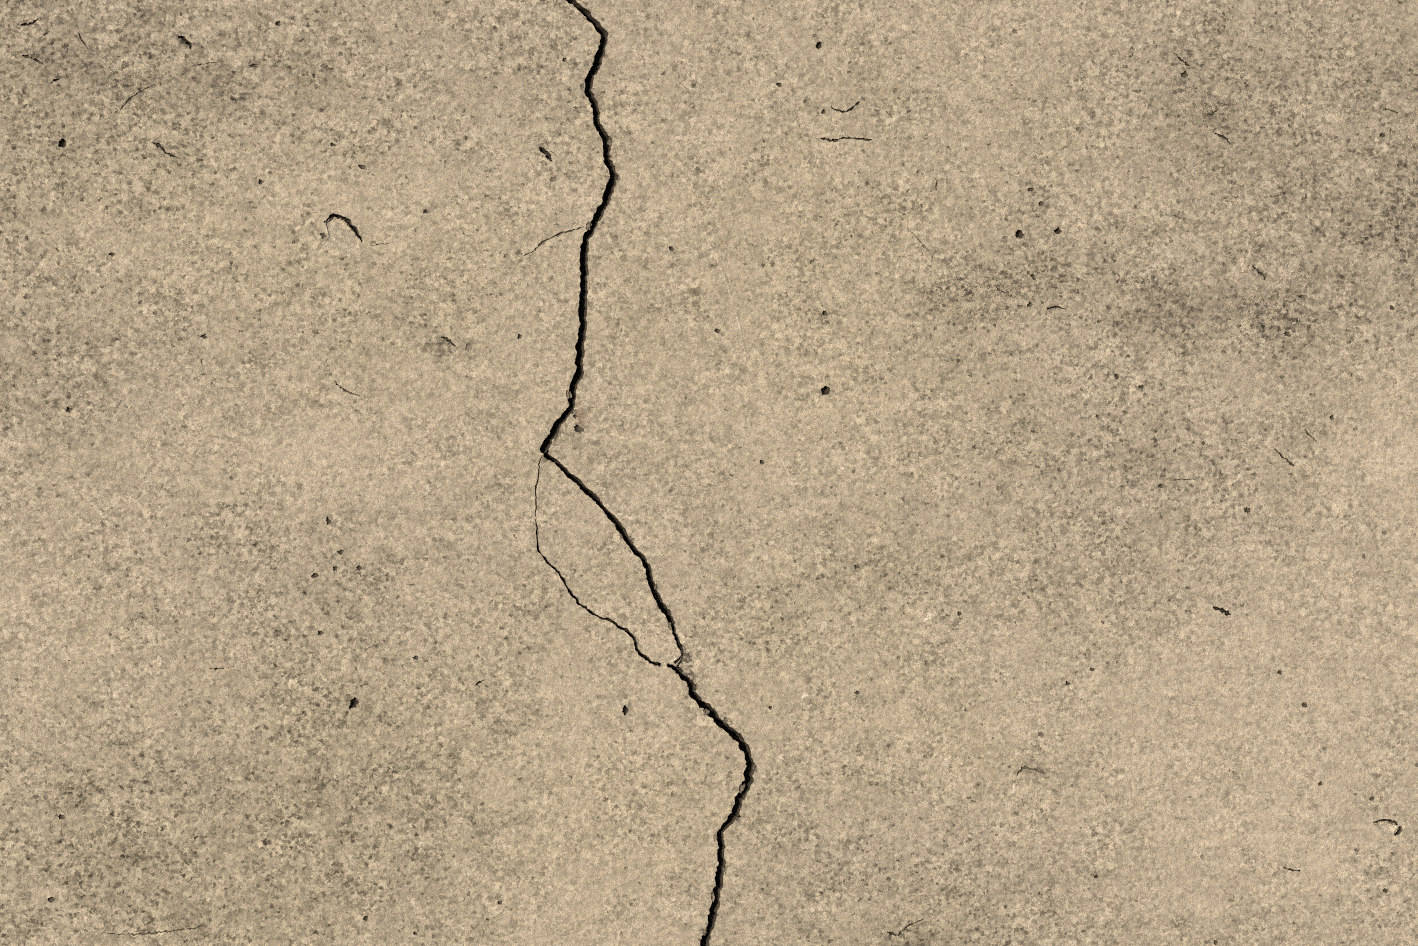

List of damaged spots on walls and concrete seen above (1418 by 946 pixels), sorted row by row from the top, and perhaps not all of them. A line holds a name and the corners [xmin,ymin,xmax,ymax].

crack [524,0,757,946]